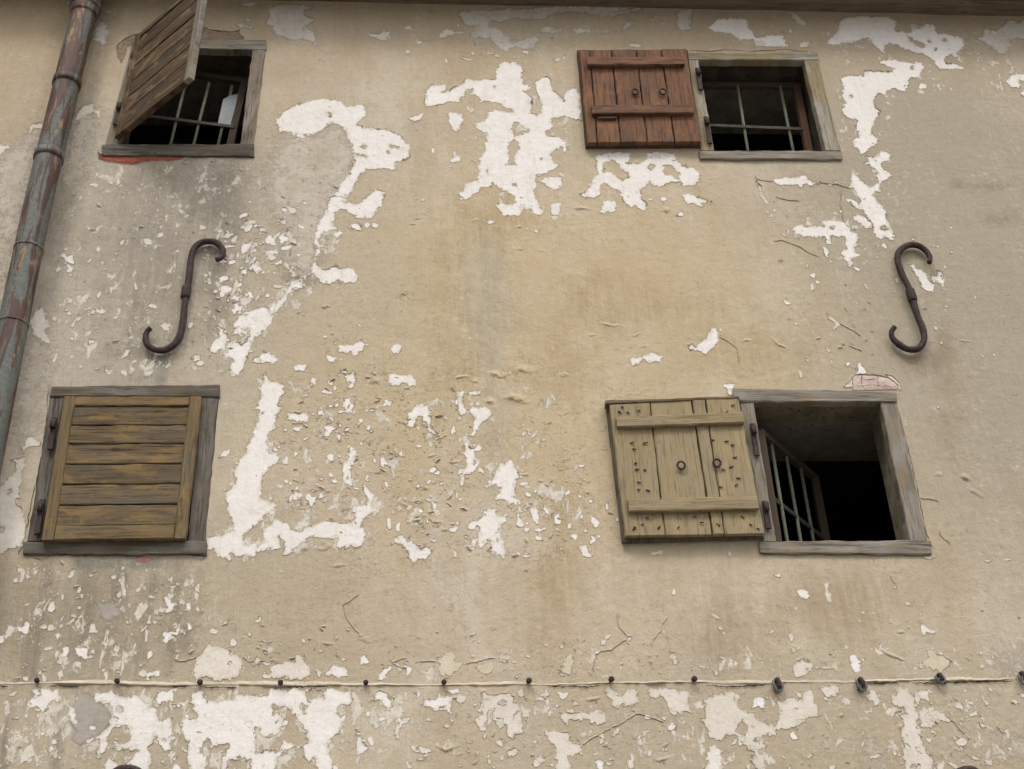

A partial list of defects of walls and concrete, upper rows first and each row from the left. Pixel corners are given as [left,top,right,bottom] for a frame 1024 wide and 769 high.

peeling [407,6,642,234]
peeling [578,151,713,217]
peeling [708,12,810,53]
crack [820,182,848,222]
peeling [754,15,1024,325]
peeling [0,98,619,565]
flaking render [816,308,903,392]
peeling [0,556,1024,769]